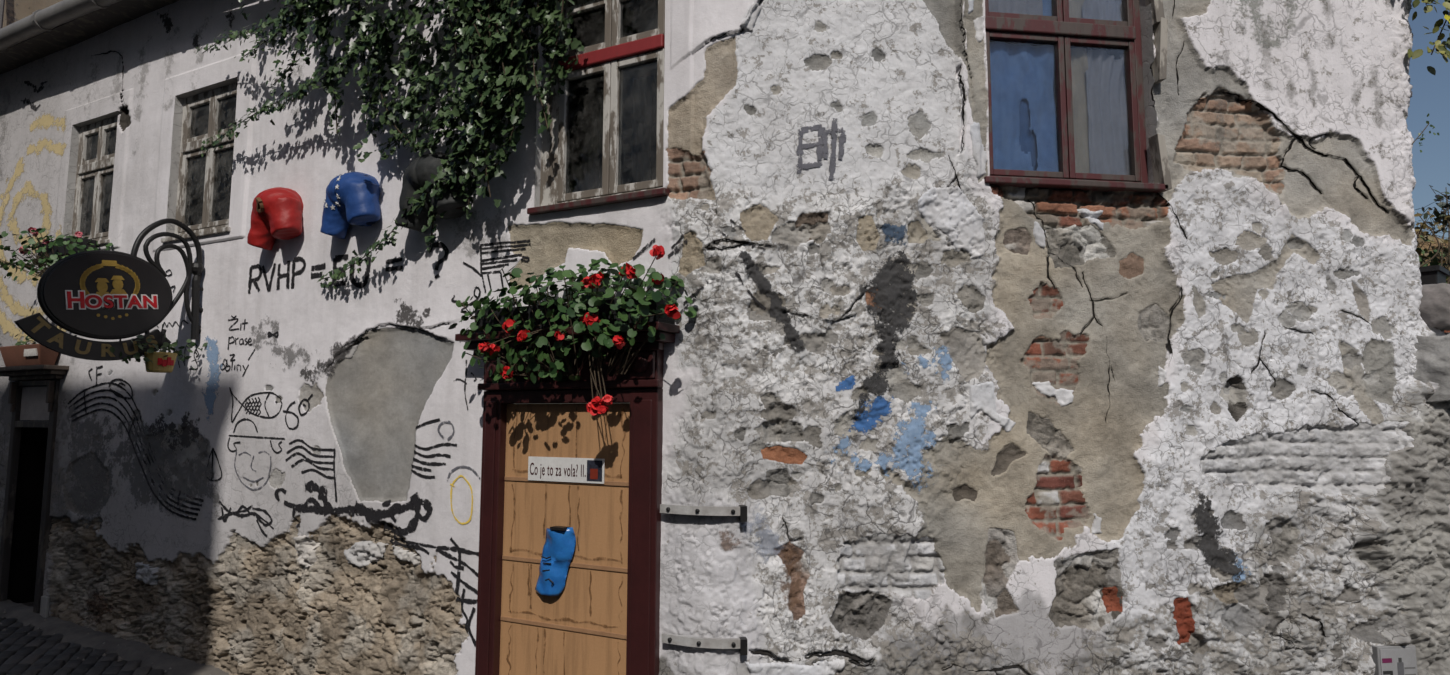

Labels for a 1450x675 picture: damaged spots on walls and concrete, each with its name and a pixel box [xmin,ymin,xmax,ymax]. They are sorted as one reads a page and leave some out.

flaking render [666,37,738,210]
crack [948,0,972,194]
crack [1172,0,1389,213]
crack [705,238,773,250]
peeling [678,204,831,277]
crack [789,284,867,321]
flaking render [734,0,1416,640]
crack [1028,200,1127,421]
flaking render [48,327,469,675]
peeling [1145,554,1305,674]
peeling [1330,618,1390,659]